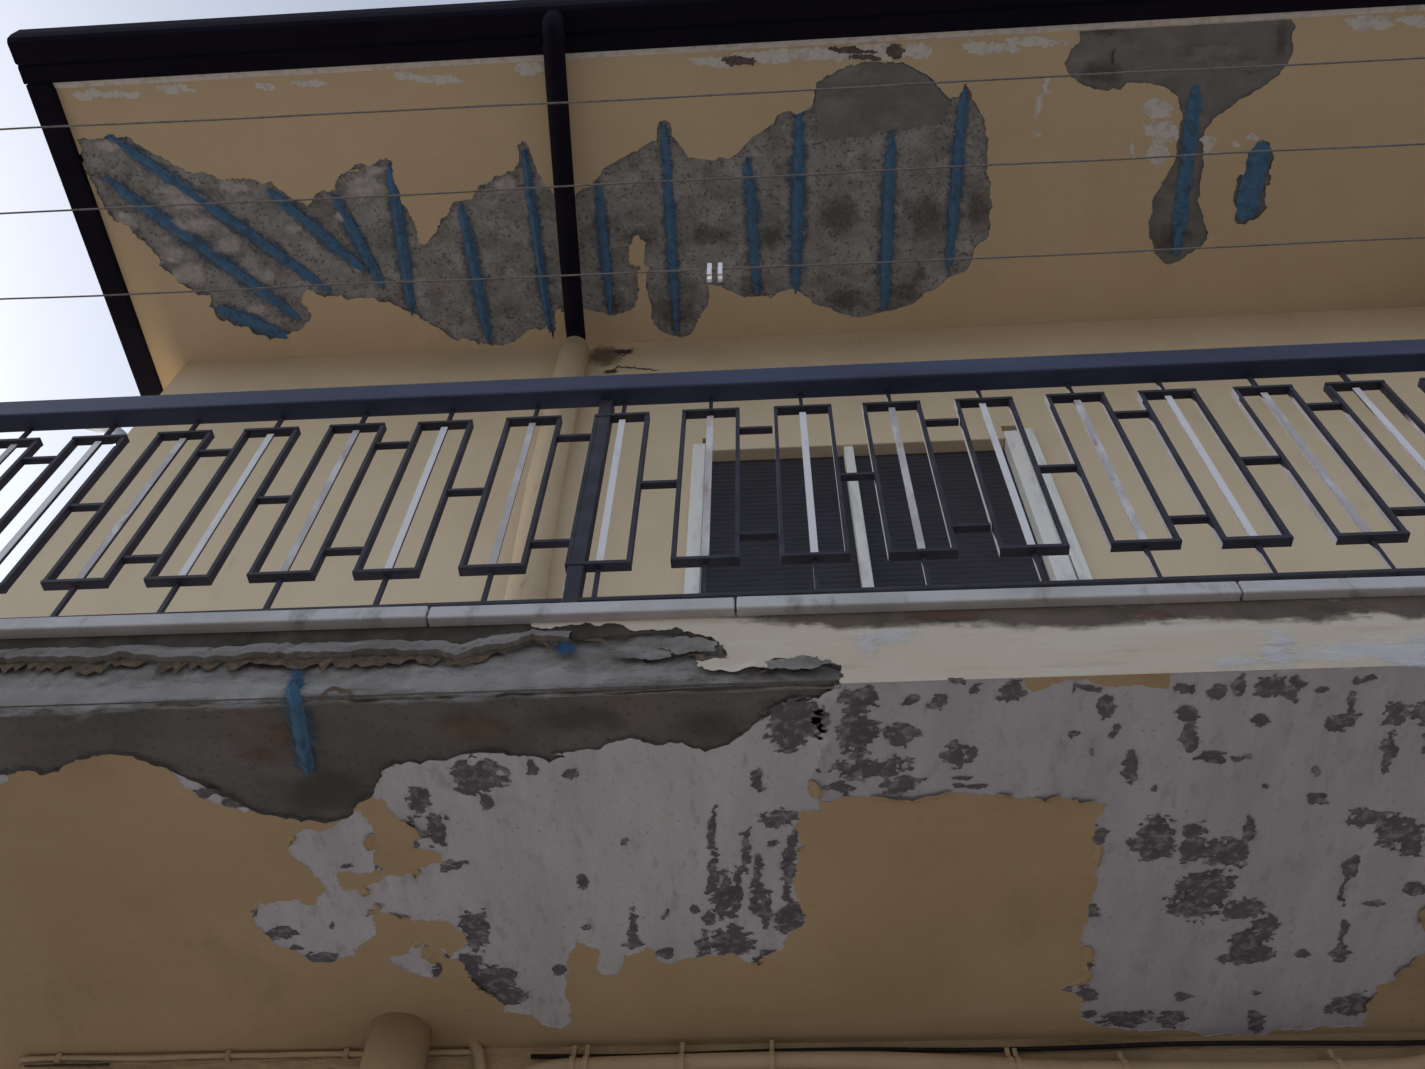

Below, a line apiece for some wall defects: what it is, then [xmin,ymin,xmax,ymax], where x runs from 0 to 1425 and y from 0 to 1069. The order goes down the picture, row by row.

peeling [72,84,197,101]
spalling [77,134,564,346]
peeling [392,70,463,85]
spalling [575,42,993,338]
spalling [962,19,1296,265]
peeling [0,622,1425,1036]